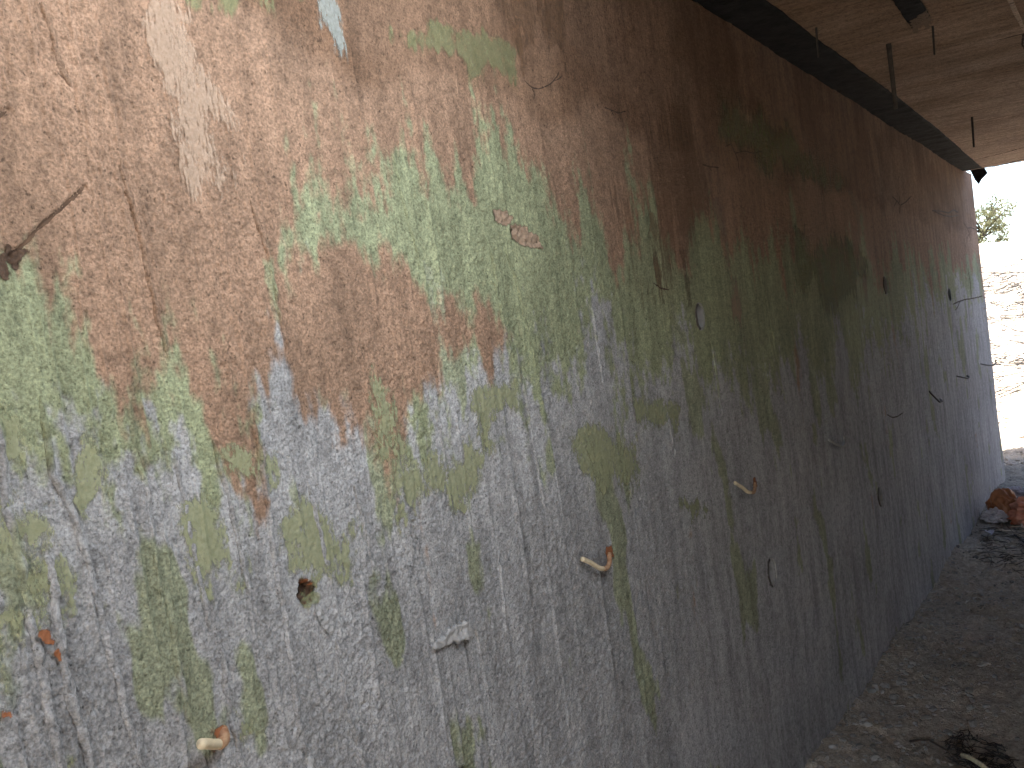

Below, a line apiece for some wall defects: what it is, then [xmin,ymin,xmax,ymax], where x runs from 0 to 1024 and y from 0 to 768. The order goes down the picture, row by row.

leakage [142,0,240,202]